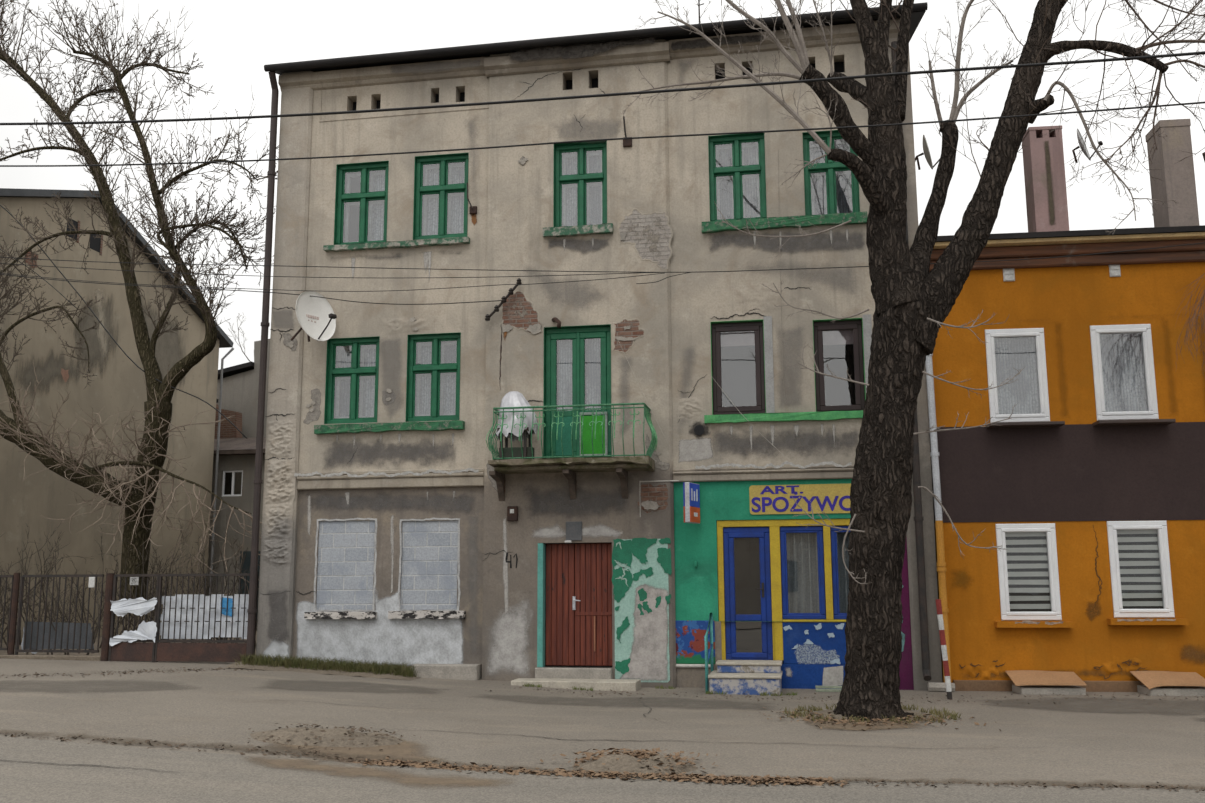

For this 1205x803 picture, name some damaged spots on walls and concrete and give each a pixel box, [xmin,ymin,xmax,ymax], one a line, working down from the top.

spalling [617,208,673,270]
water stain [711,229,864,252]
spalling [500,290,544,335]
spalling [612,318,645,354]
spalling [636,435,670,515]
crack [1093,526,1102,603]
peeling [783,623,844,686]